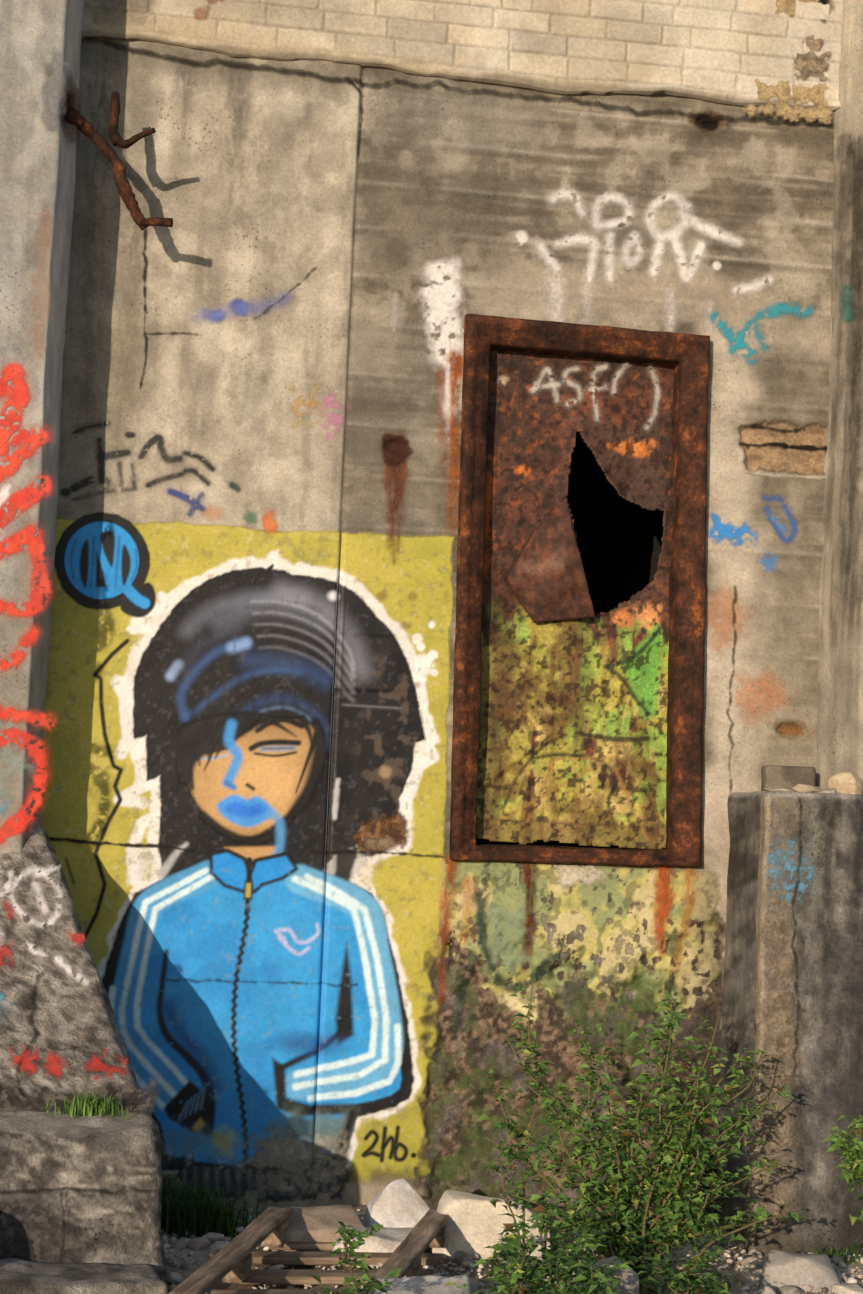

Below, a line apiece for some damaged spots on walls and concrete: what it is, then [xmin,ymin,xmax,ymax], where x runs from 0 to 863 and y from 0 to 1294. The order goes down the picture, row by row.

spalling [775,0,831,23]
spalling [689,111,729,132]
spalling [742,35,832,124]
crack [140,229,178,388]
rust [383,434,412,542]
spalling [738,421,828,479]
crack [727,587,736,740]
rust [655,866,690,952]